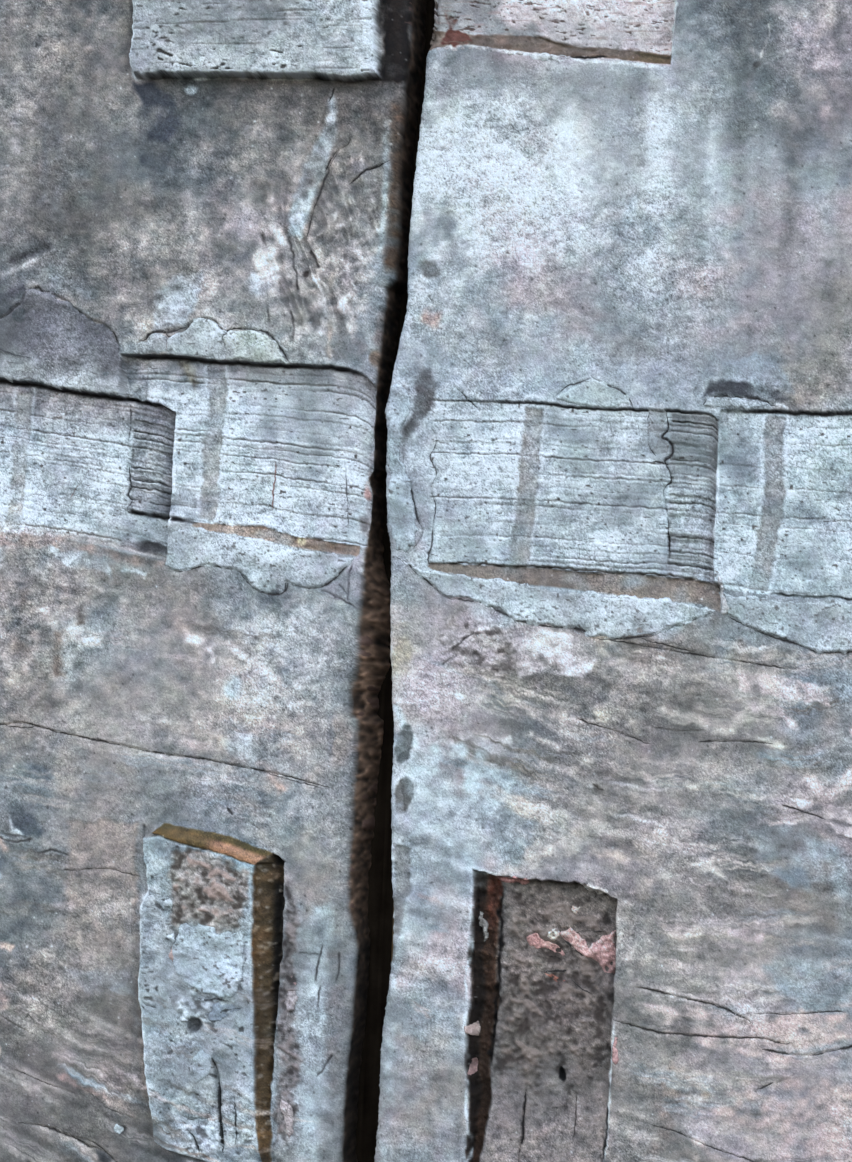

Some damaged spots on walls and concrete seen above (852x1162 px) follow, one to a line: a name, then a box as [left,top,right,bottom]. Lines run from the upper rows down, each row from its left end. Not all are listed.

rust [440,11,473,49]
water stain [801,0,852,150]
crack [306,137,389,238]
water stain [811,256,846,303]
peeling [165,527,354,597]
peeling [386,384,852,654]
crack [0,721,335,789]
spalling [164,846,254,1022]
spalling [269,870,305,1162]
spalling [478,876,619,1099]
crack [615,987,852,1090]
spalling [191,1119,225,1157]